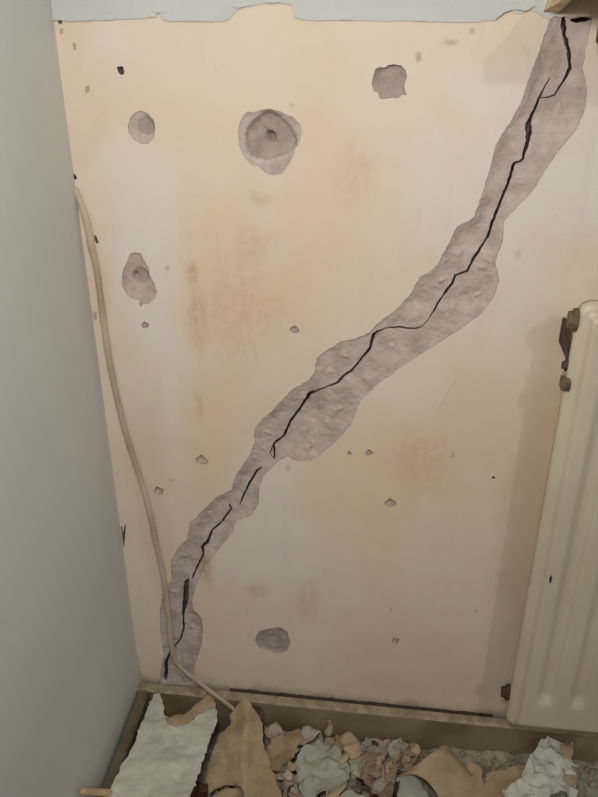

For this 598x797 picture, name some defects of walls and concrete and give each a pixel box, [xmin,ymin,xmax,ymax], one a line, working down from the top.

flaking render [50,0,593,685]
crack [164,17,592,680]